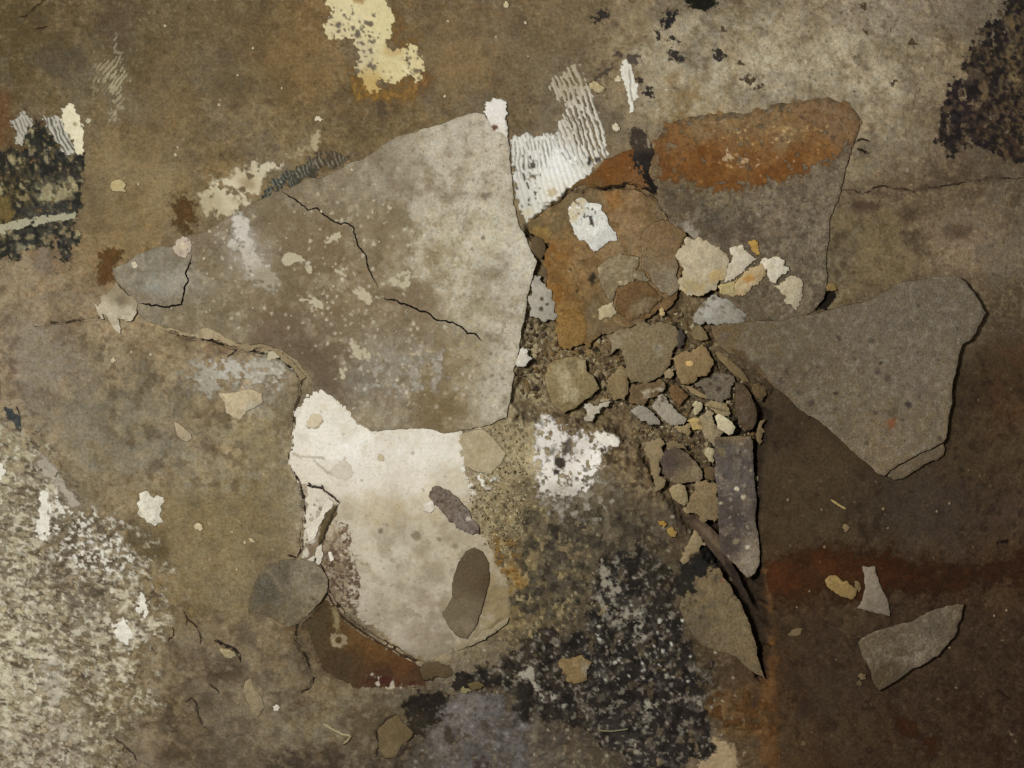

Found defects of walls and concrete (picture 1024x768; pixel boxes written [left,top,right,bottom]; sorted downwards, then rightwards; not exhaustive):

spalling [612,122,657,193]
corrosion [652,97,862,194]
water stain [0,212,76,235]
crack [281,190,483,342]
spalling [516,347,532,367]
peeling [554,302,617,350]
spalling [583,401,611,422]
spalling [630,405,660,425]
peeling [701,447,714,466]
spalling [288,389,511,660]
water stain [461,414,719,768]
corrosion [765,542,1024,613]